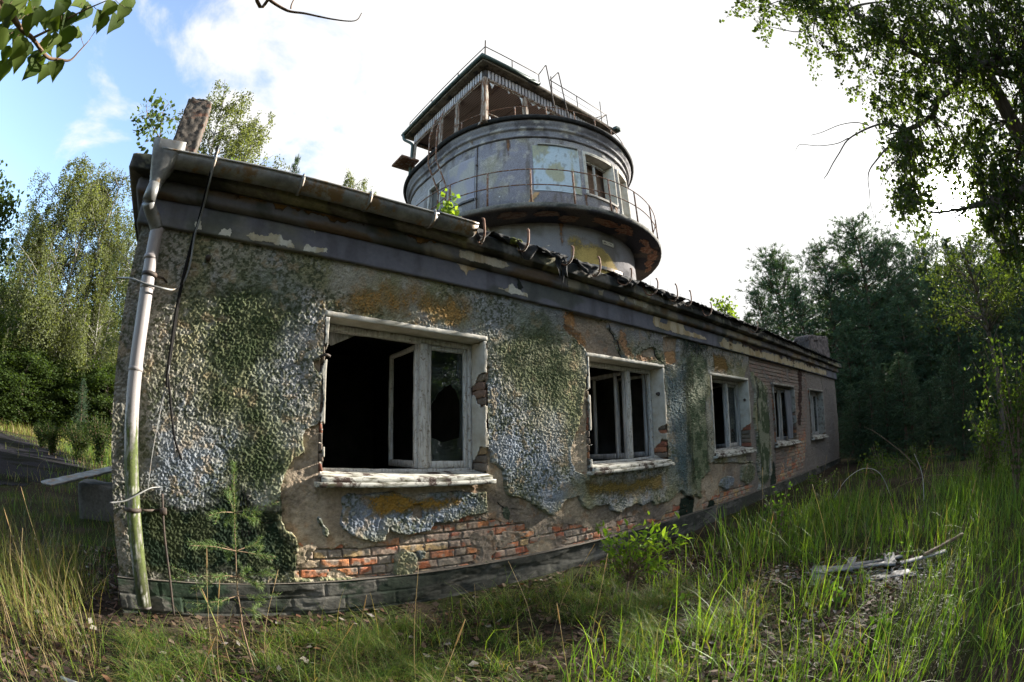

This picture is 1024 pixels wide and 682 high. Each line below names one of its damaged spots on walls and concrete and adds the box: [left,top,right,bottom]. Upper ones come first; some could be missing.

peeling [247,232,327,253]
flaking render [280,337,839,580]